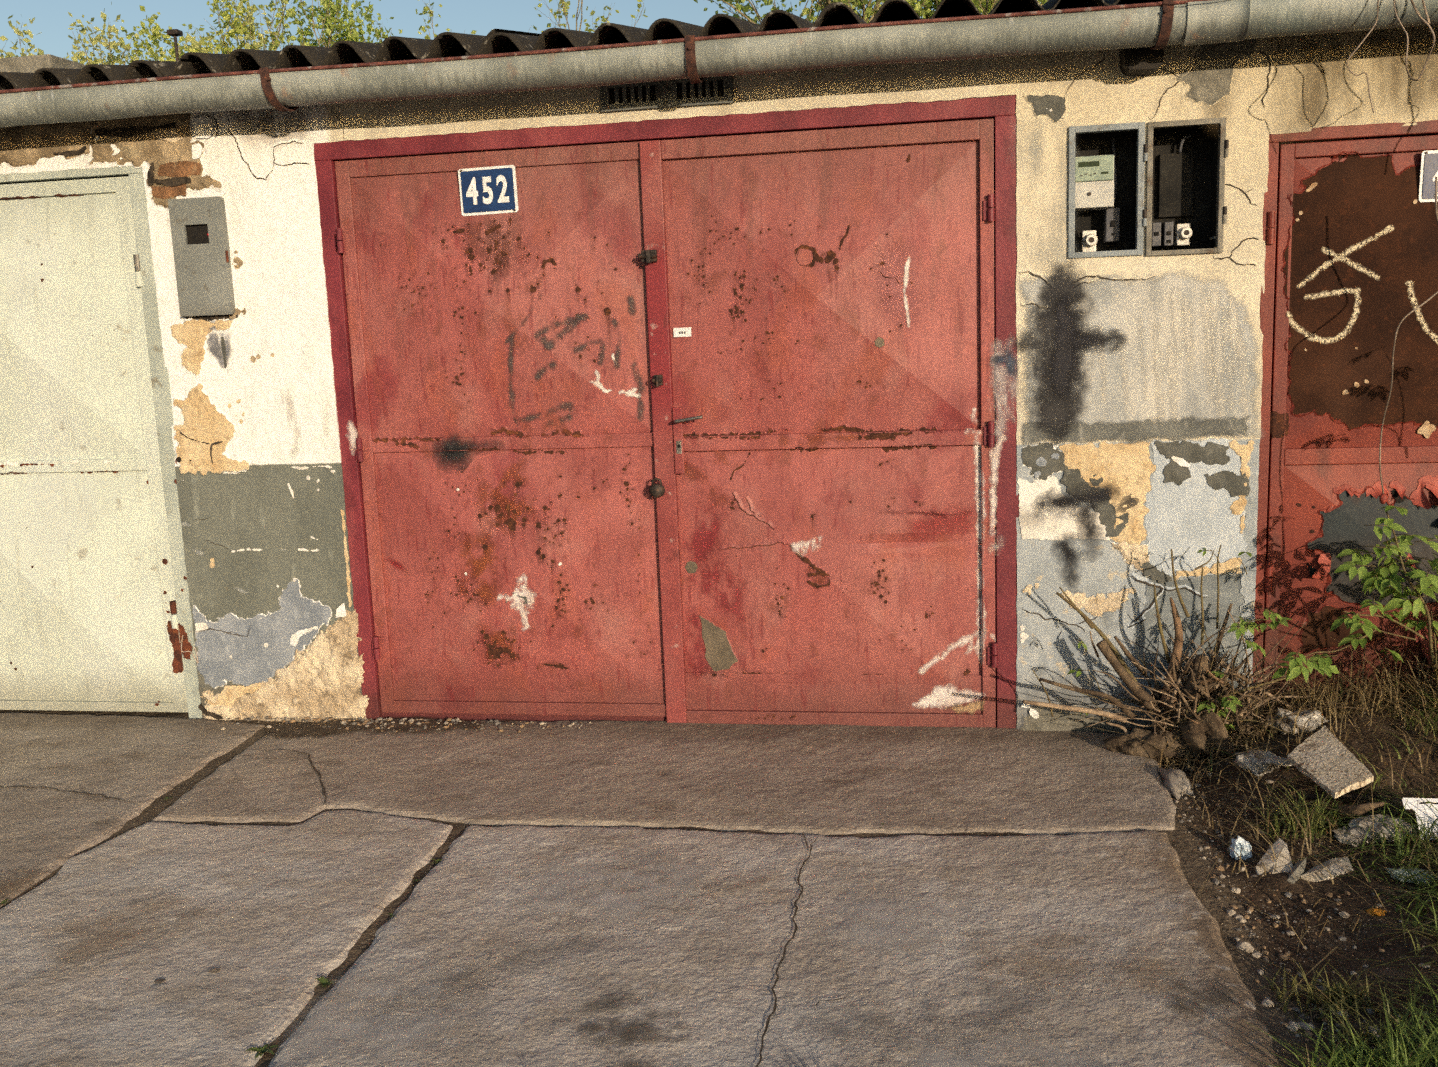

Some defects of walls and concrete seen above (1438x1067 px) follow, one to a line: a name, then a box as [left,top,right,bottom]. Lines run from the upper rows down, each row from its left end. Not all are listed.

flaking render [0,113,225,209]
crack [214,113,310,180]
corrosion [399,218,557,315]
corrosion [687,215,850,355]
flaking render [170,308,256,481]
corrosion [163,576,193,674]
flaking render [192,509,369,722]
corrosion [444,454,640,627]
peeling [1017,437,1254,693]
crack [0,786,131,802]
crack [260,749,327,804]
crack [755,832,819,1067]